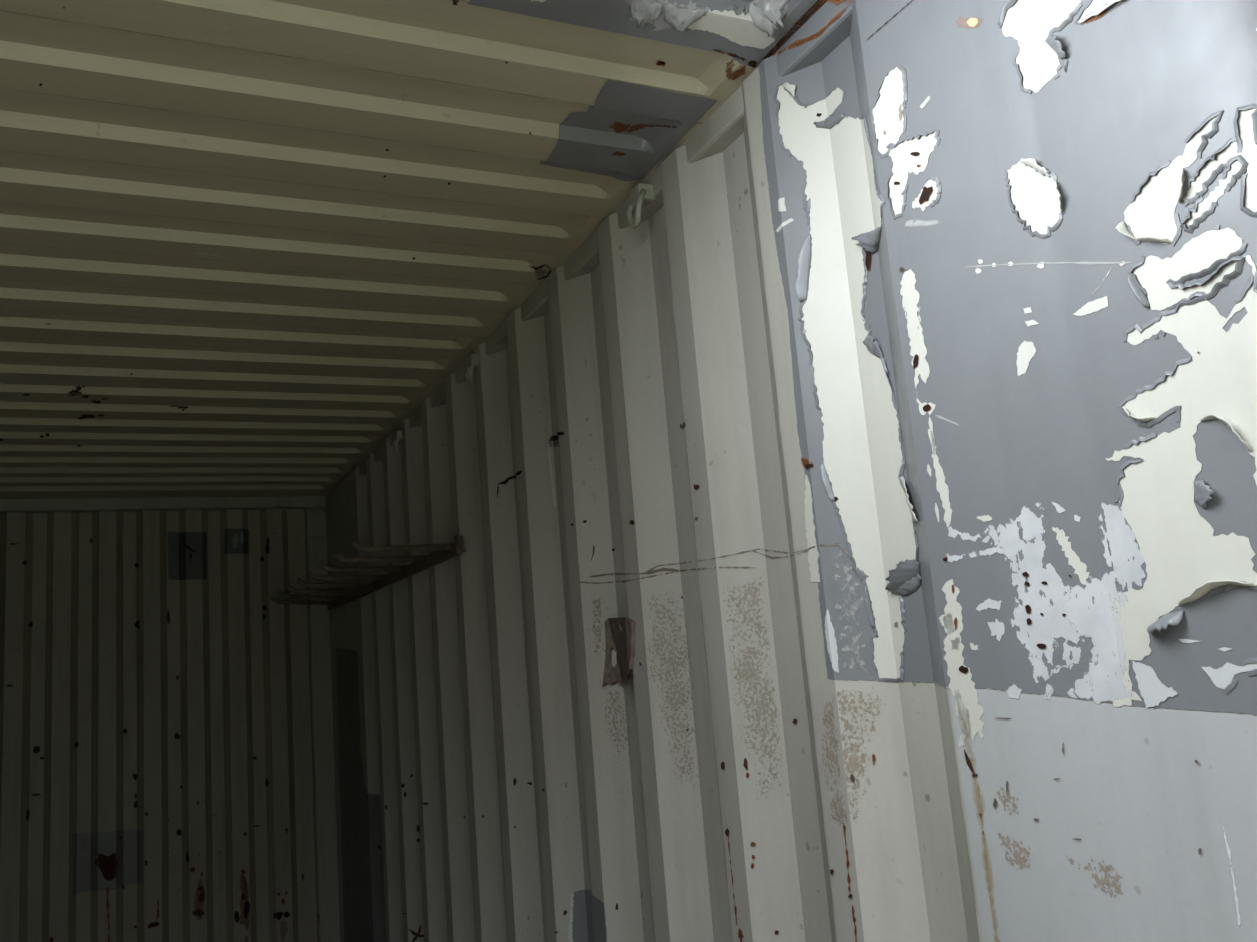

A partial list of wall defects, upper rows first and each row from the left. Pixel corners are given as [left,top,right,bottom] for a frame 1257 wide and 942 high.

peeling [626,0,790,50]
corrosion [714,0,846,80]
peeling [998,0,1124,94]
corrosion [611,122,677,133]
peeling [1004,158,1065,239]
peeling [773,63,940,682]
peeling [1016,341,1036,376]
peeling [1073,104,1257,709]
corrosion [95,853,117,942]
corrosion [234,869,250,928]